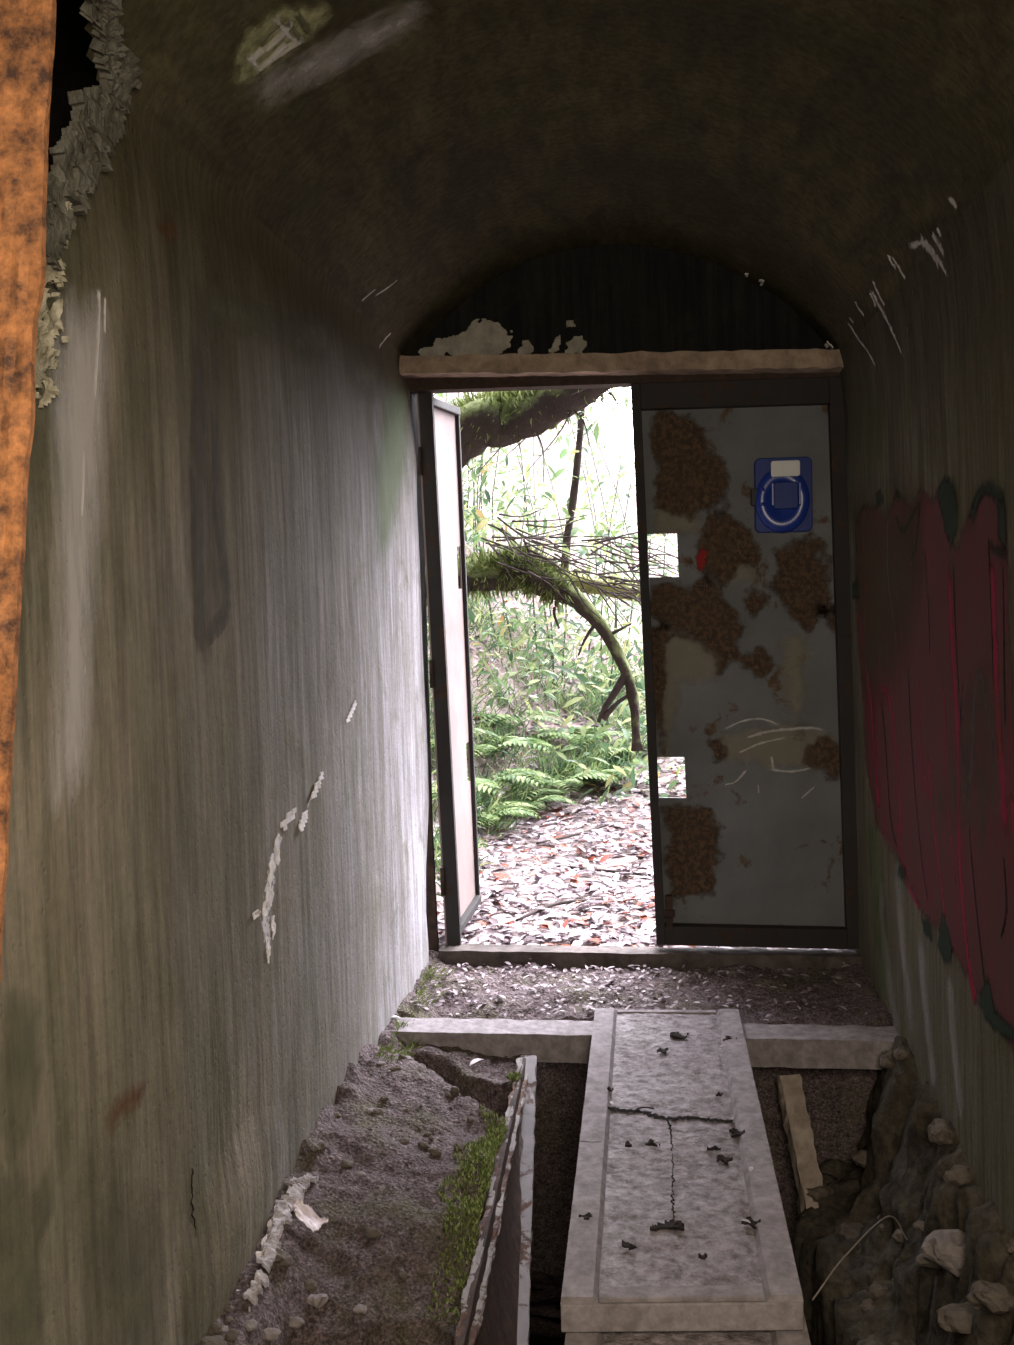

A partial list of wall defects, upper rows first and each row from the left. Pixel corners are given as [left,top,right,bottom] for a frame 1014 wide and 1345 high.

flaking render [236,6,330,82]
peeling [252,771,324,964]
crack [189,1168,197,1236]
crack [608,1106,733,1218]